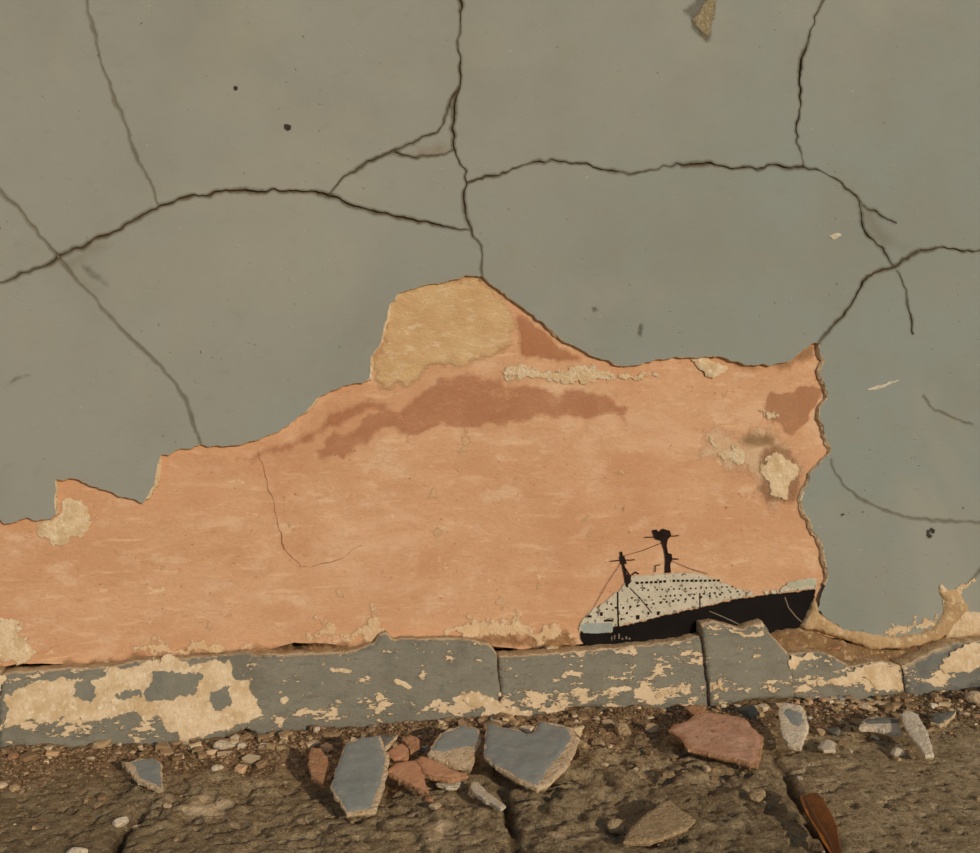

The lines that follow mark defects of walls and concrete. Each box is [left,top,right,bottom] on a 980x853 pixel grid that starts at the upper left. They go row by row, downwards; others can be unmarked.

peeling [687,0,716,41]
crack [0,0,980,443]
crack [258,452,359,567]
peeling [0,275,832,743]
crack [831,461,977,523]
peeling [817,662,903,693]
peeling [939,642,980,674]